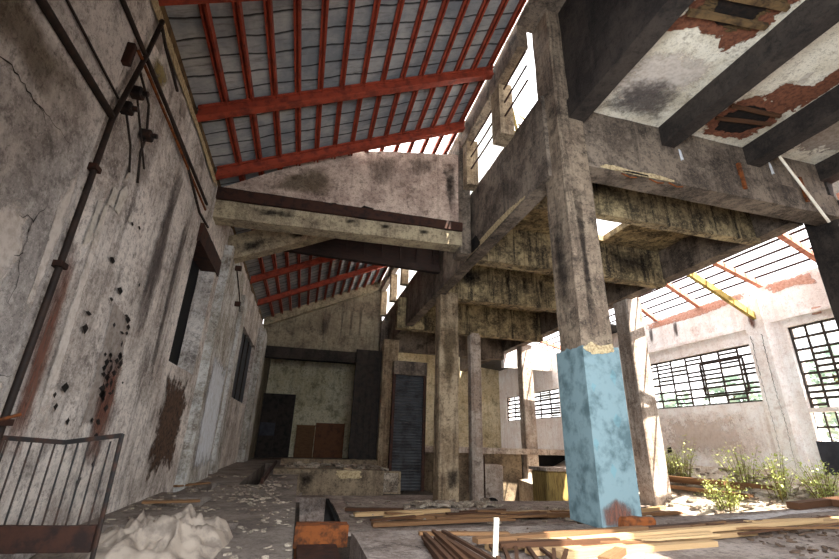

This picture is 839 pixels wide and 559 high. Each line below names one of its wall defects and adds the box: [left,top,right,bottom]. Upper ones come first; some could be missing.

crack [0,56,70,143]
leakage [607,53,711,116]
flaking render [766,72,828,112]
flaking render [792,121,839,154]
corrosion [86,363,120,460]
flaking render [146,375,187,480]